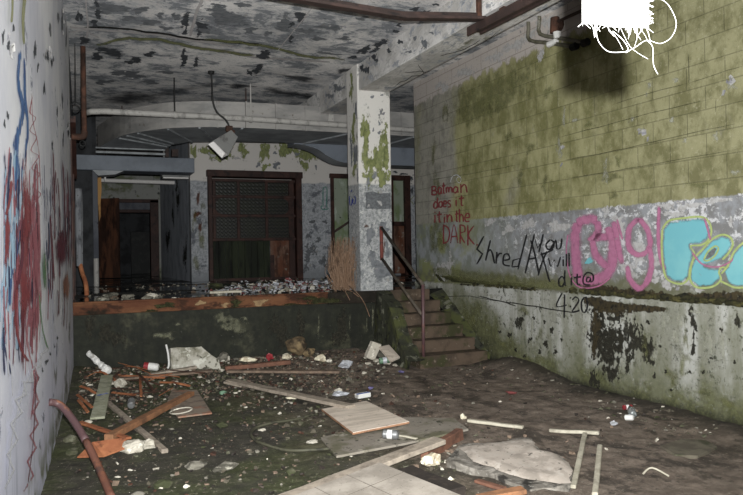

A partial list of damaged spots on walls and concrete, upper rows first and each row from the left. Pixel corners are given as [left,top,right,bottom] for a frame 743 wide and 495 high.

peeling [90,1,181,31]
peeling [198,2,351,41]
peeling [91,46,173,85]
peeling [317,23,403,74]
crack [448,296,572,313]
leakage [580,284,666,389]
leakage [673,291,743,371]